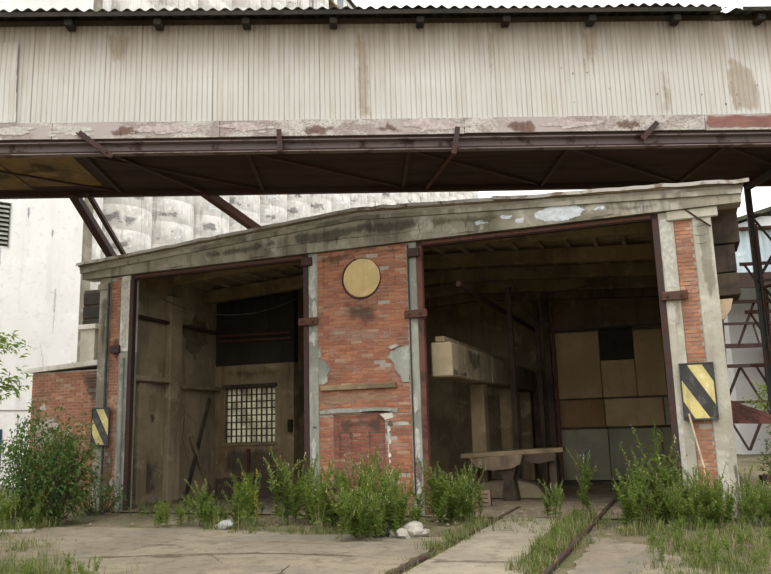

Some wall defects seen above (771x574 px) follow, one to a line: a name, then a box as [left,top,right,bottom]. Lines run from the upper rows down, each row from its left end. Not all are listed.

peeling [0,127,35,135]
peeling [48,126,94,137]
peeling [130,124,198,134]
rust [306,125,332,134]
rust [508,121,534,132]
peeling [534,205,605,222]